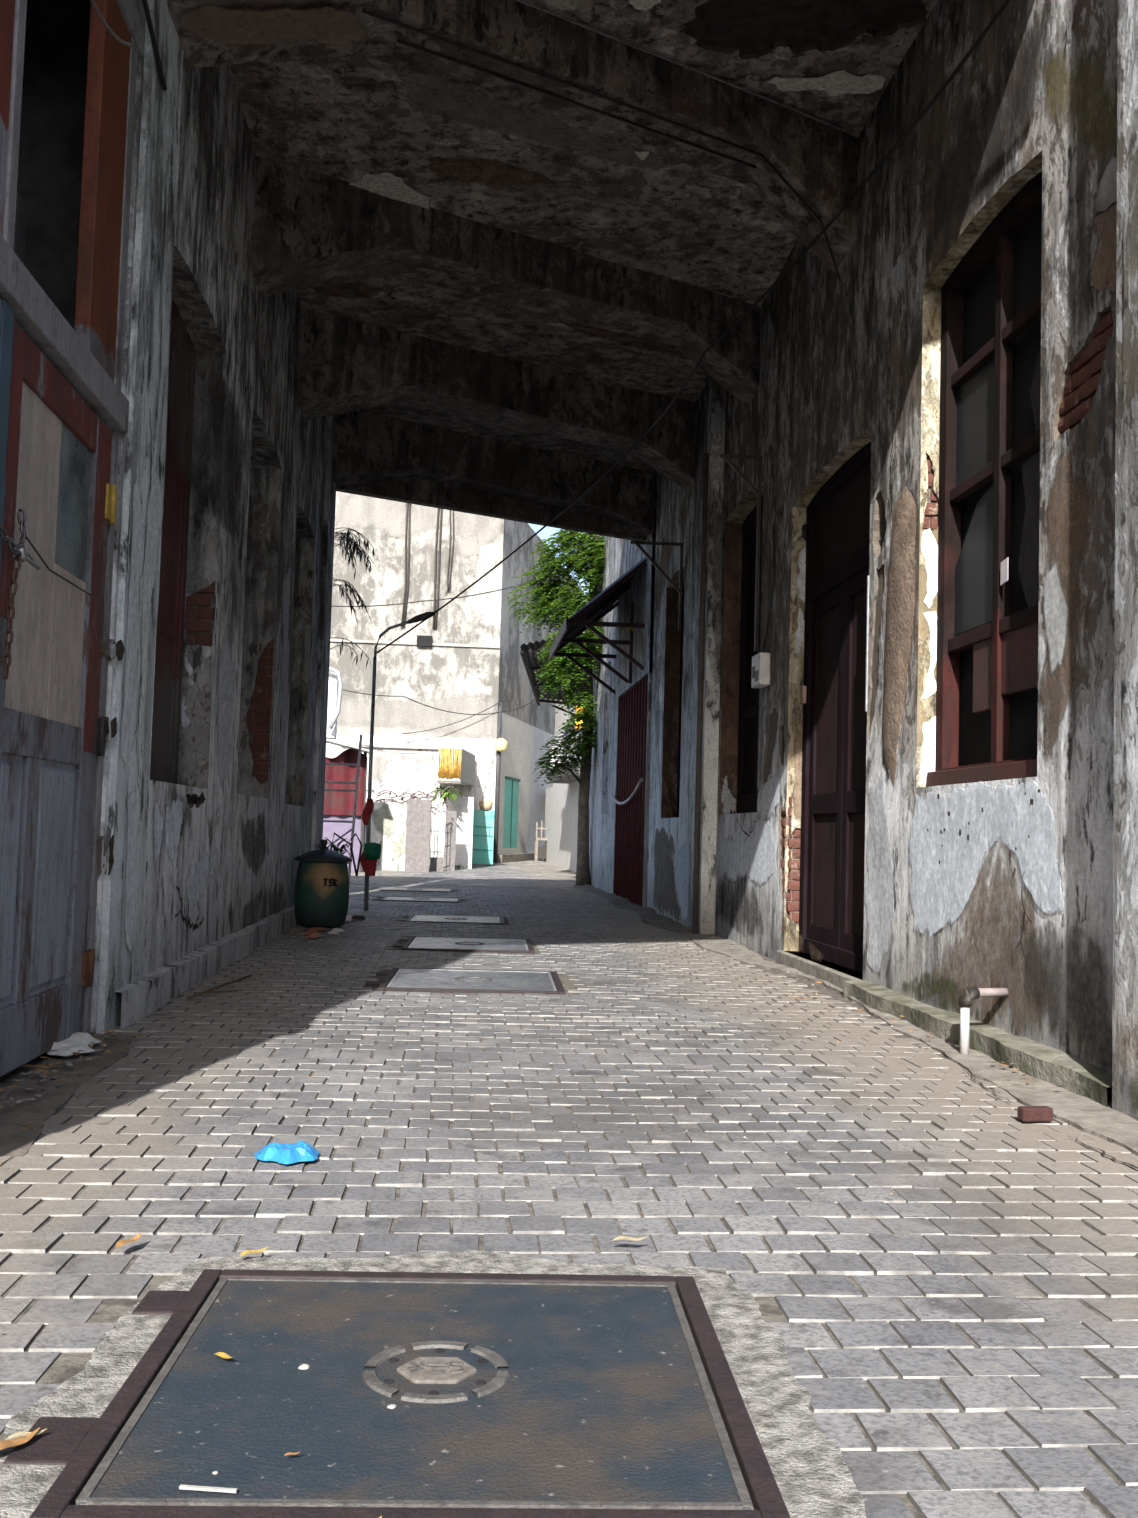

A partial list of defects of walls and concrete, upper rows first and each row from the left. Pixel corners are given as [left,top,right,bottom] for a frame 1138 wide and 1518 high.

peeling [767,70,886,96]
flaking render [1058,201,1117,437]
flaking render [181,582,218,733]
flaking render [247,629,277,792]
flaking render [1039,452,1091,757]
leakage [653,828,679,921]
leakage [933,847,1113,1067]